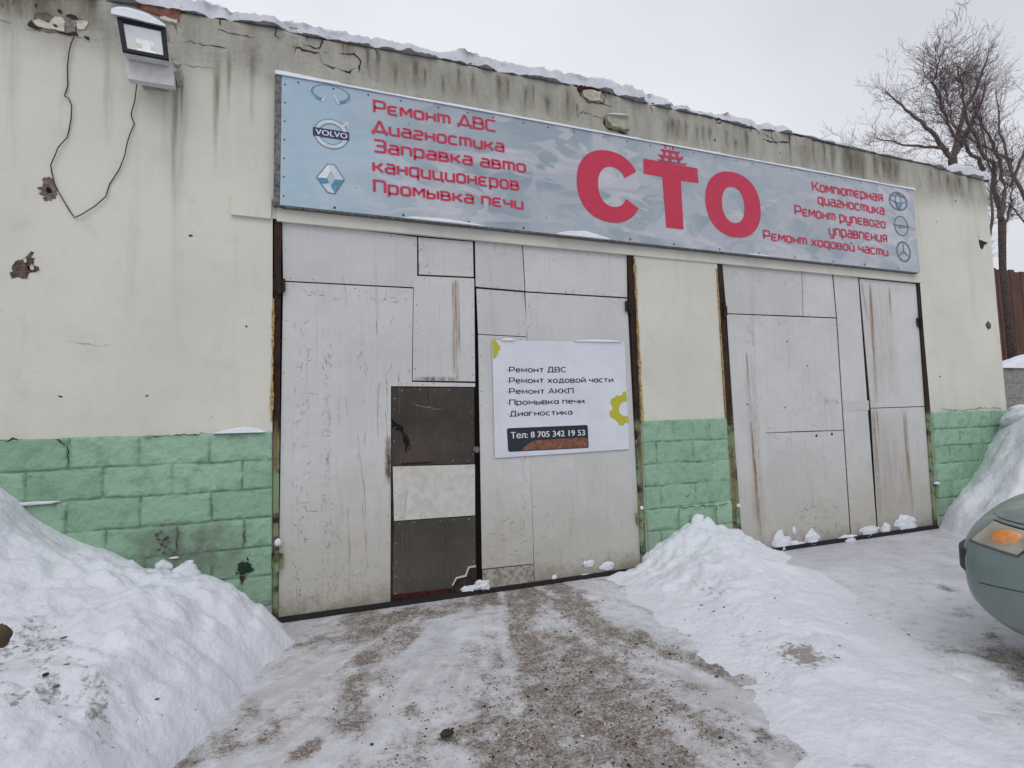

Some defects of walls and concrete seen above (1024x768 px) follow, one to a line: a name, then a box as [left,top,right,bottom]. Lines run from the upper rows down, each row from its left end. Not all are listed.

flaking render [27,3,89,40]
crack [174,18,378,73]
hole [37,177,58,201]
peeling [10,251,39,279]